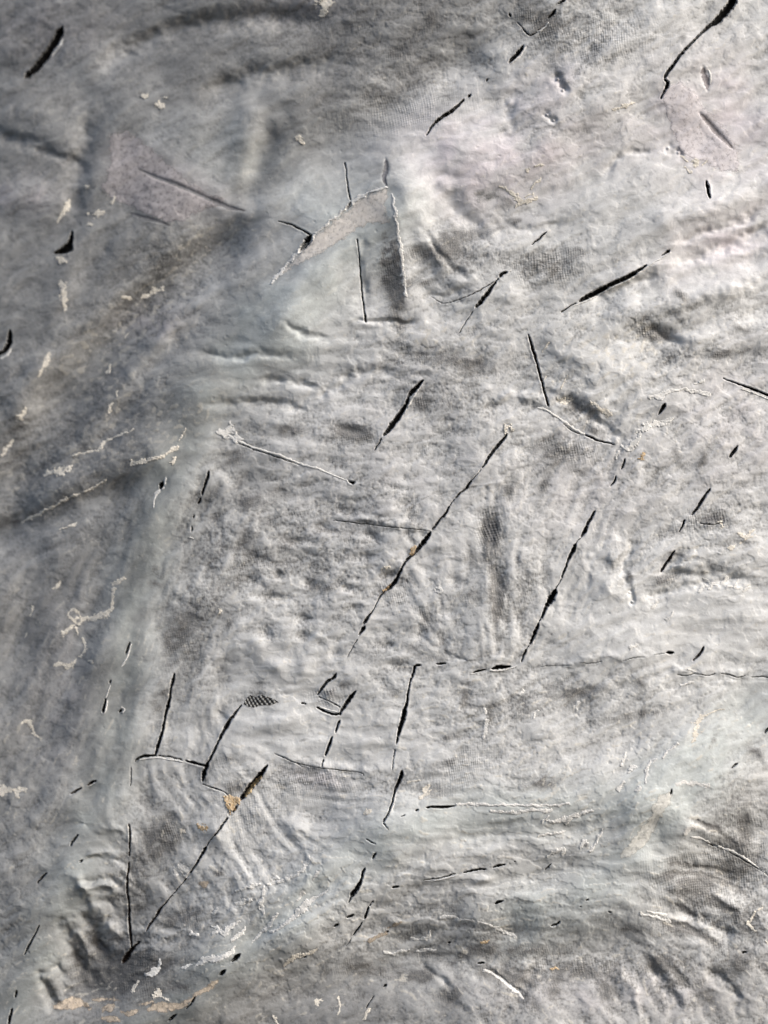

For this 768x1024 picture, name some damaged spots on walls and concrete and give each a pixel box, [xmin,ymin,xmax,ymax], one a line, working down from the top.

crack [24,26,64,79]
crack [508,0,565,64]
crack [660,0,738,99]
crack [426,79,488,136]
peeling [271,160,407,297]
crack [434,270,511,334]
crack [561,250,670,313]
crack [375,380,424,450]
crack [528,335,625,486]
crack [660,489,720,572]
crack [471,511,602,674]
crack [121,434,516,964]